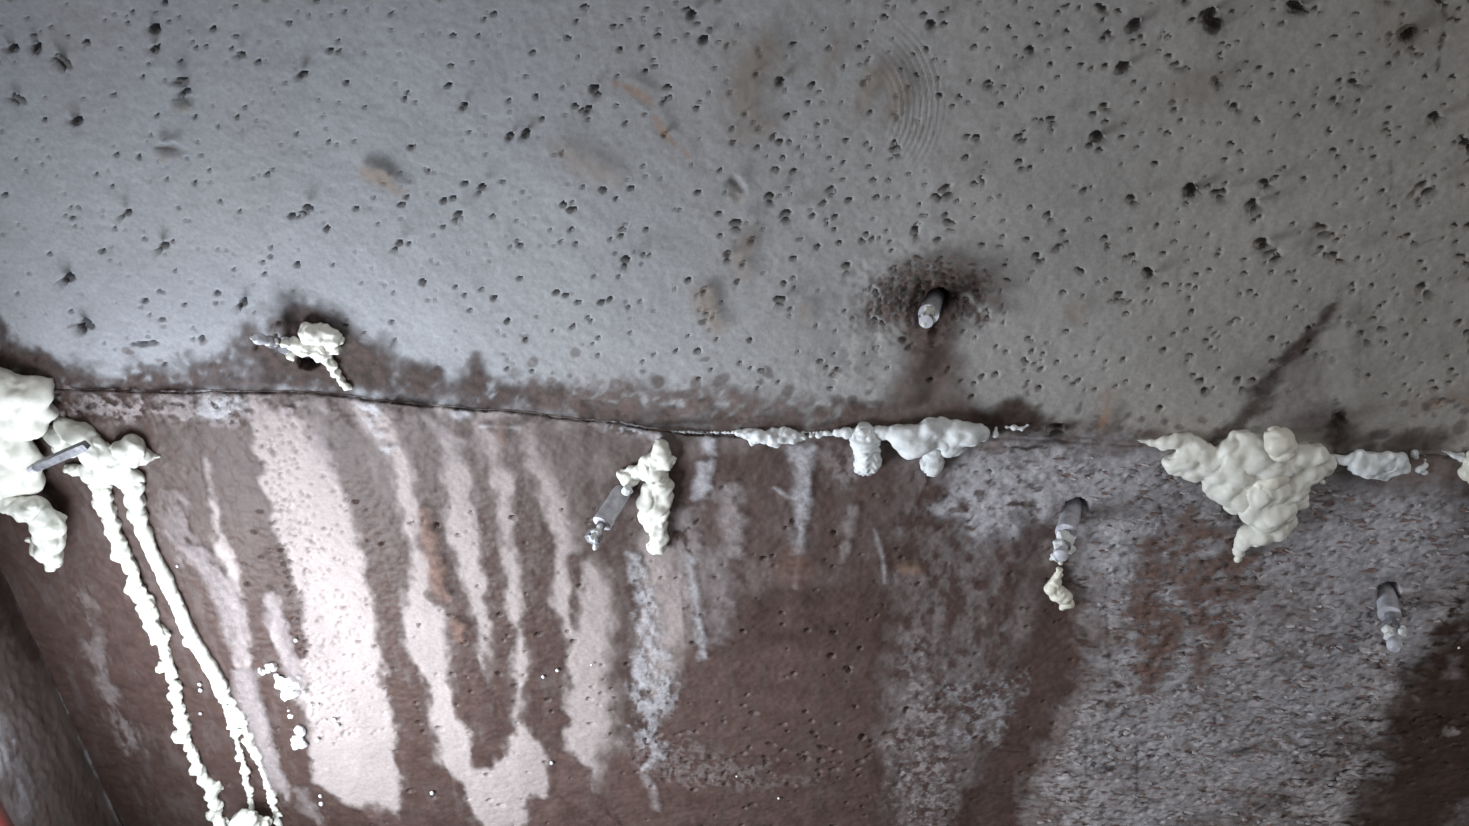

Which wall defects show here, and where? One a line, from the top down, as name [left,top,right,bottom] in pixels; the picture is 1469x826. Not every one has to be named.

crack [54,388,740,438]
crack [994,438,1127,452]
water stain [0,303,1469,826]